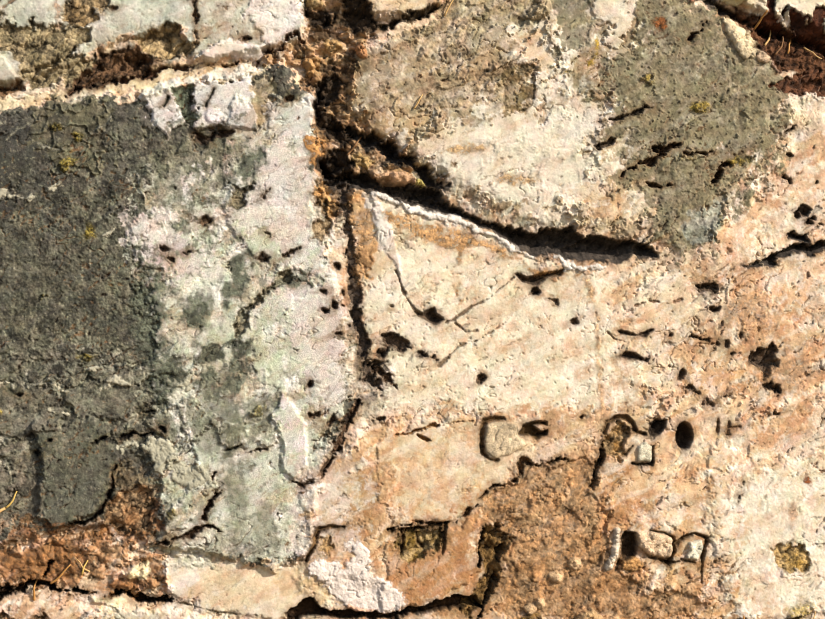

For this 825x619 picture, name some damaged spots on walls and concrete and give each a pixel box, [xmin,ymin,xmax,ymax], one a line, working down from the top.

spalling [0,0,199,94]
crack [371,1,447,32]
crack [687,0,825,75]
peeling [753,0,825,59]
peeling [768,67,825,97]
water stain [237,147,267,181]
water stain [223,249,252,305]
crack [733,231,825,269]
water stain [133,273,180,407]
water stain [180,295,214,337]
crack [292,126,658,490]
spalling [485,461,696,619]